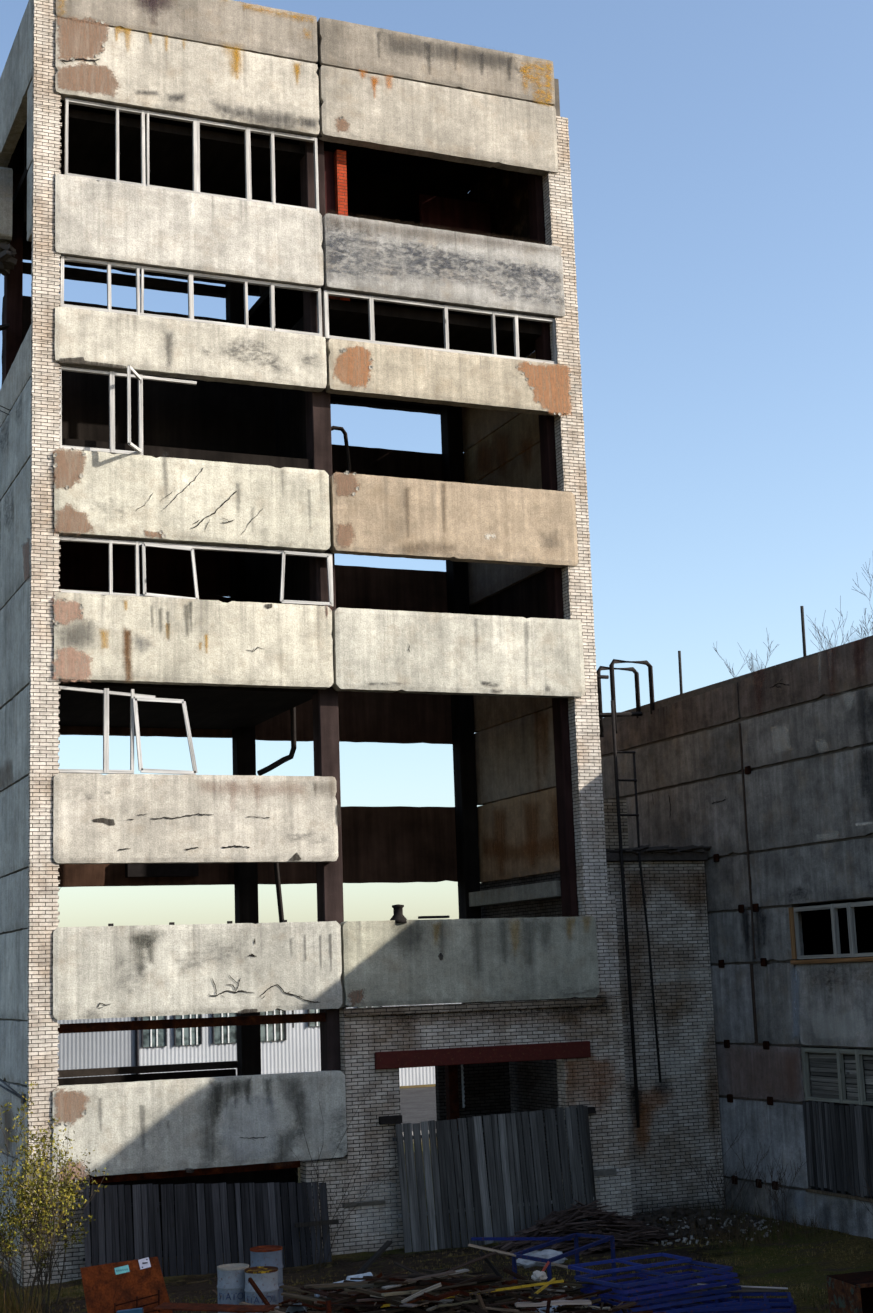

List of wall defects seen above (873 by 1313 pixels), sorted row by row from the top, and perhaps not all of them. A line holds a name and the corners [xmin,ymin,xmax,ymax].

peeling [56,17,119,96]
leakage [329,226,560,303]
peeling [333,346,374,387]
peeling [516,361,573,416]
peeling [53,448,93,534]
crack [136,467,204,511]
crack [190,491,263,533]
peeling [53,595,84,625]
peeling [53,646,93,682]
leakage [137,935,153,970]
crack [208,939,320,1003]
peeling [55,1088,91,1126]